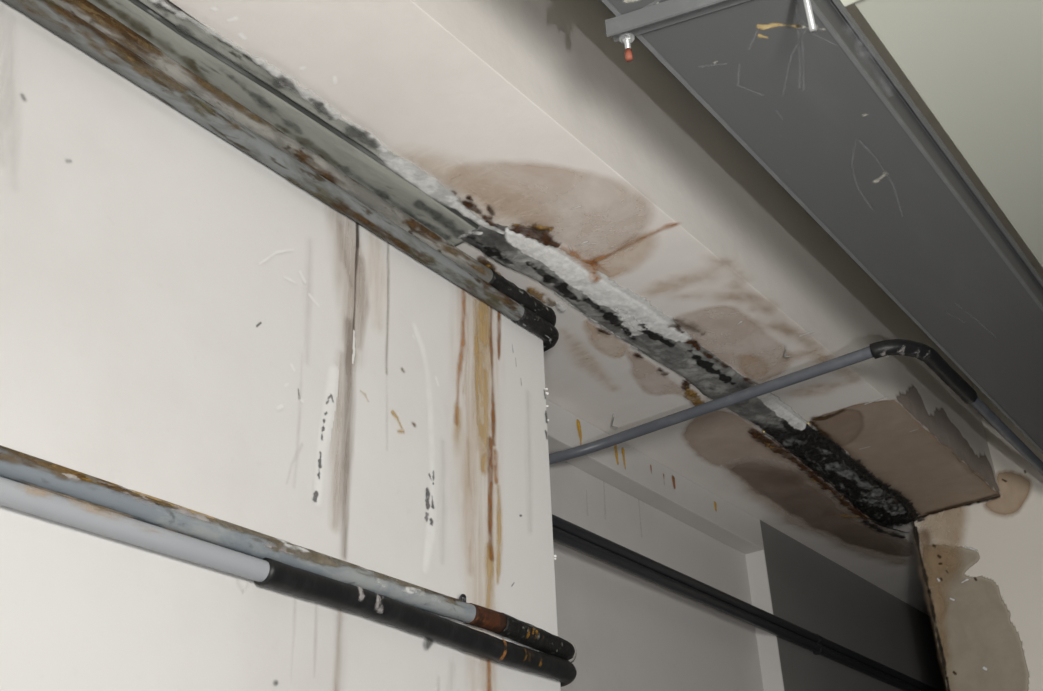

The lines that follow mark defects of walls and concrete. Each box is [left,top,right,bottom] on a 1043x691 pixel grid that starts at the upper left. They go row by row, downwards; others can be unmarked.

corrosion [50,0,262,122]
corrosion [296,150,335,183]
corrosion [287,178,434,263]
corrosion [450,191,610,281]
corrosion [405,218,516,606]
leakage [682,380,945,641]
leakage [810,386,1030,545]
peeling [913,496,1029,691]